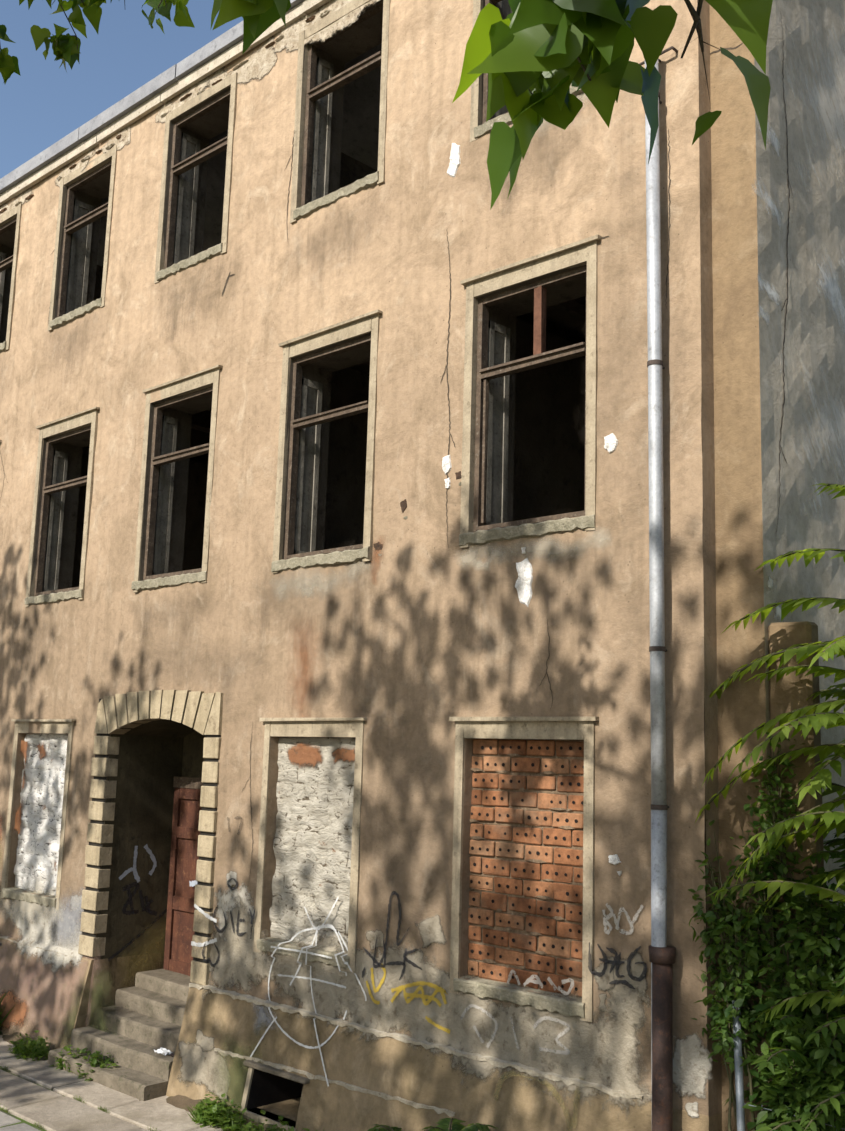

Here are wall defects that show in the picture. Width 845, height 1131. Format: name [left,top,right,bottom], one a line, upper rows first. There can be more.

spalling [155,0,379,123]
crack [776,18,793,532]
crack [441,232,456,548]
spalling [0,895,84,1029]
peeling [196,1030,214,1052]
spalling [203,871,652,1111]
spalling [673,1034,712,1118]